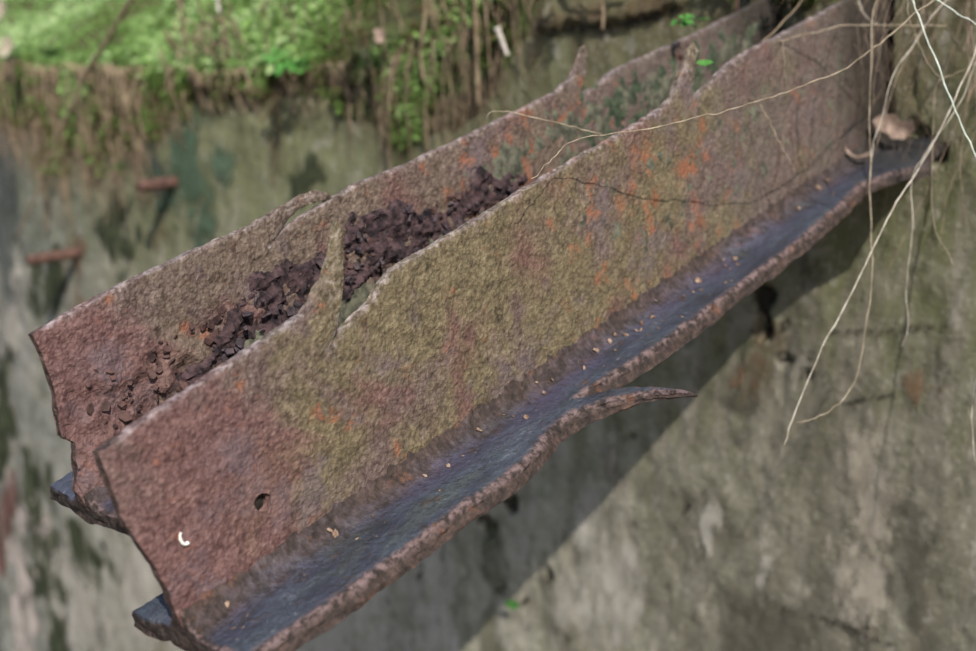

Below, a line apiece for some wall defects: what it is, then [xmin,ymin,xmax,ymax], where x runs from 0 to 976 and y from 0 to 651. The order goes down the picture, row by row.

damp [0,119,23,374]
corrosion [342,165,528,303]
corrosion [175,251,326,387]
damp [6,508,39,651]